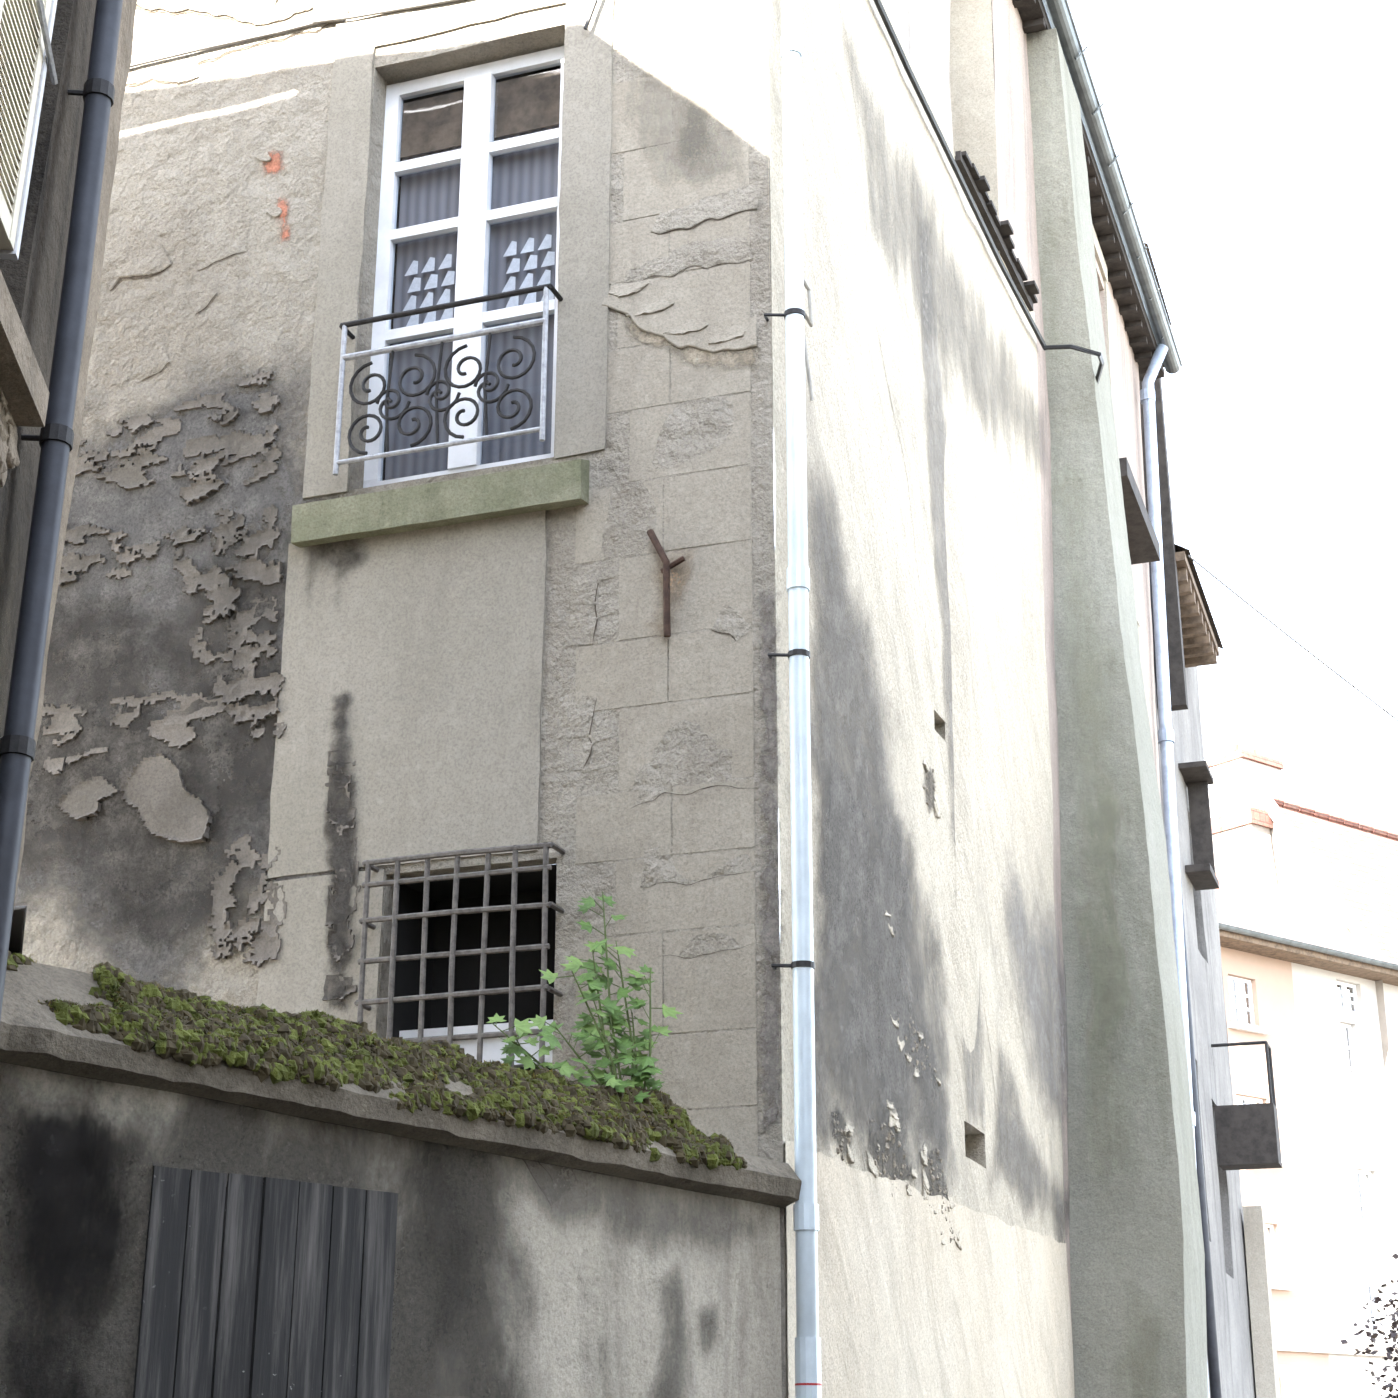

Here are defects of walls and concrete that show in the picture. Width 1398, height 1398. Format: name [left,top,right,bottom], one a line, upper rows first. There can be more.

crack [126,0,353,86]
crack [624,179,763,283]
spalling [0,386,20,488]
flaking render [42,369,287,844]
water stain [310,540,362,567]
water stain [13,379,336,990]
flaking render [923,759,942,819]
flaking render [207,834,287,968]
water stain [0,1070,521,1398]
flaking render [831,1101,962,1251]
water stain [658,1281,685,1398]
water stain [702,1311,716,1340]